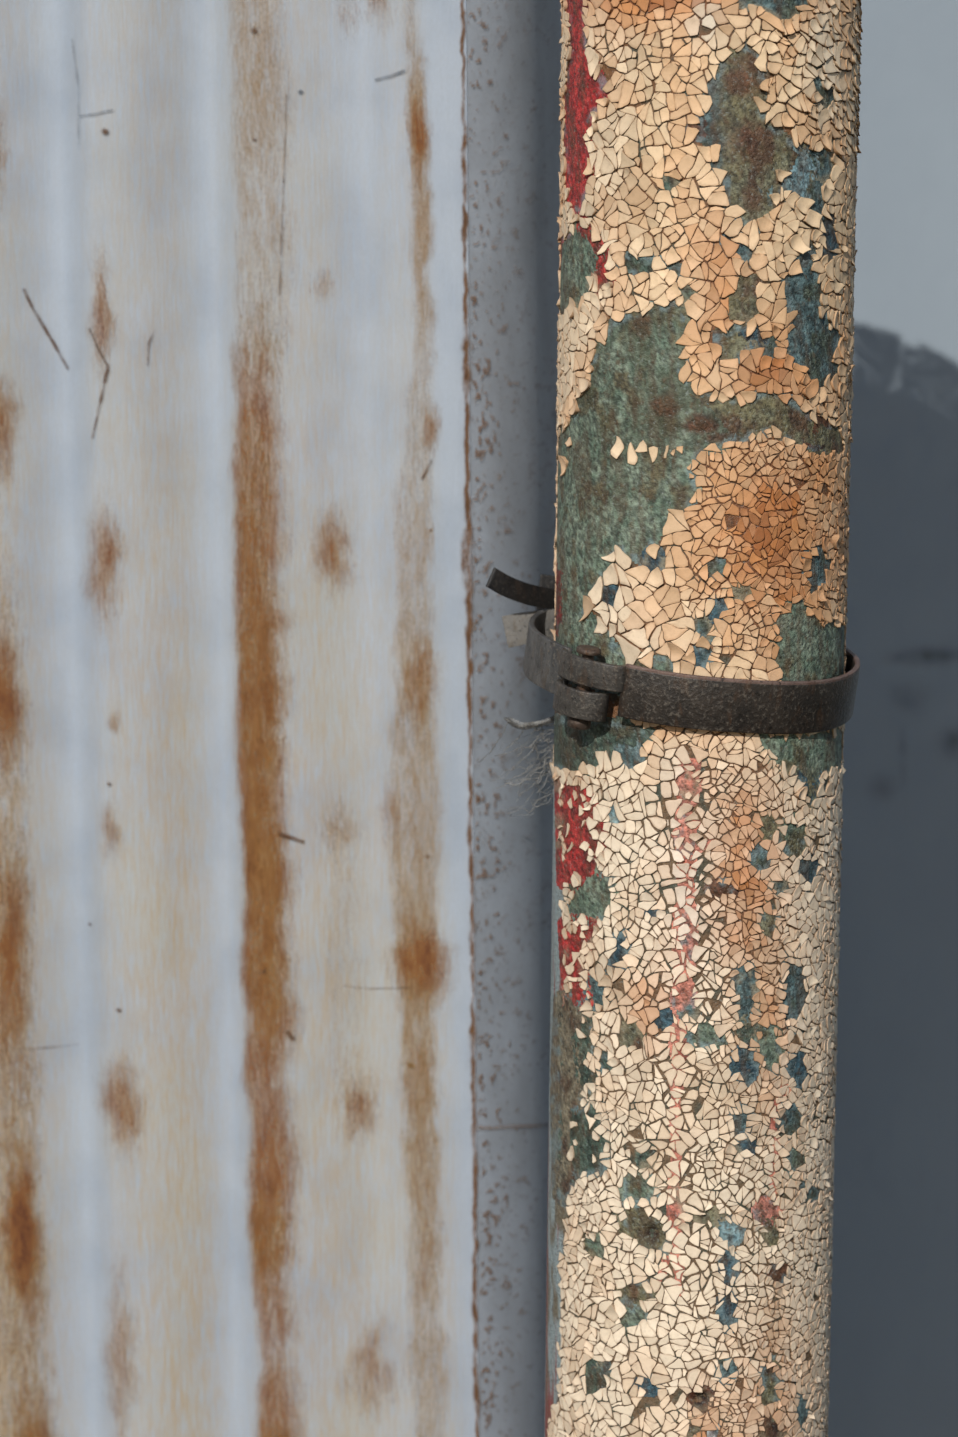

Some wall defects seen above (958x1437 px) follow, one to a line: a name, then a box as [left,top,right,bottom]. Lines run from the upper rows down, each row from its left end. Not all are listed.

rust [410,70,429,314]
peeling [550,0,851,681]
crack [553,0,863,681]
rust [1,1152,41,1313]
rust [232,350,296,1437]
rust [394,770,445,1225]
rust [460,0,509,1437]
peeling [575,1358,614,1412]
peeling [550,712,842,1336]
crack [547,719,846,1437]
spalling [685,1358,739,1437]
peeling [756,1354,813,1436]